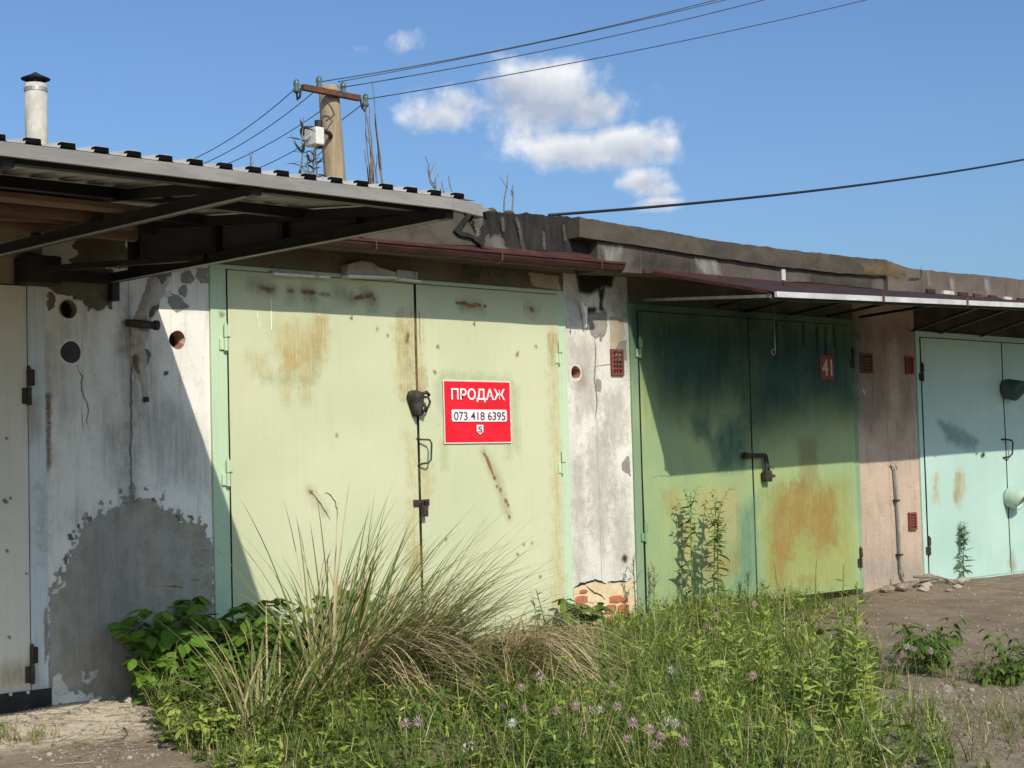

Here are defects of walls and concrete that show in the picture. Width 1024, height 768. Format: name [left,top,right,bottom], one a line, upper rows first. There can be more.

peeling [168,268,209,312]
crack [77,364,90,430]
crack [127,361,135,480]
spalling [44,482,214,698]
spalling [573,581,635,626]